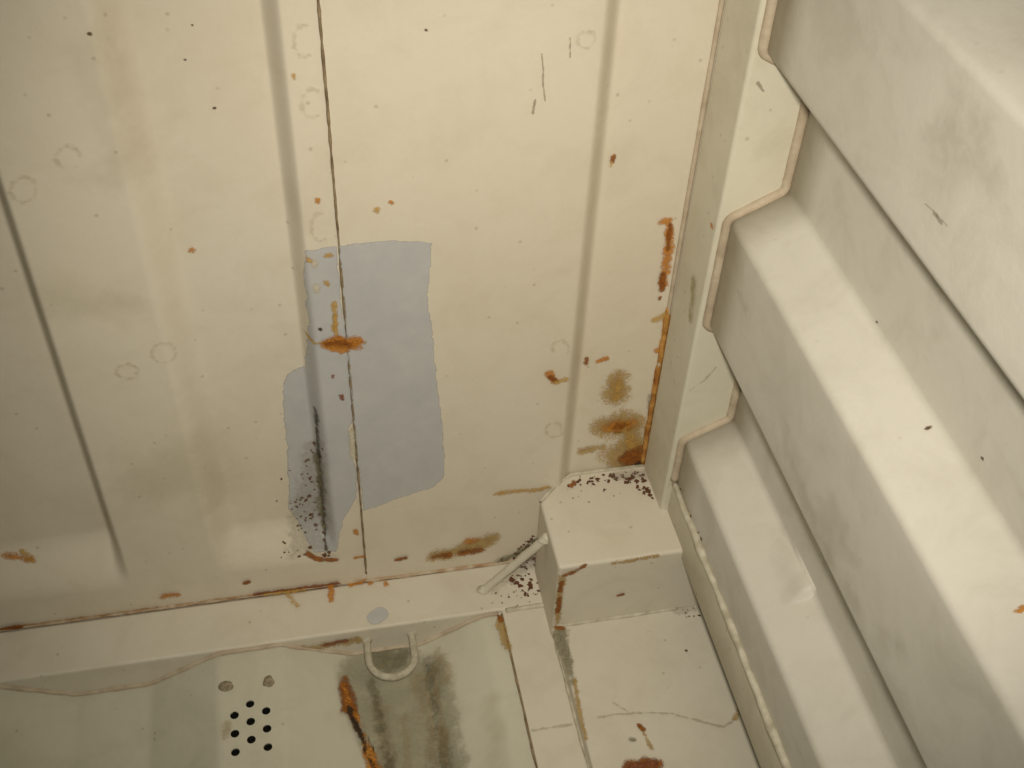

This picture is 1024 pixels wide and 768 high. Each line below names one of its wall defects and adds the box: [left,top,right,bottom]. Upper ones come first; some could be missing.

rust [305,301,366,354]
rust [578,218,674,467]
peeling [276,441,331,558]
crack [305,406,339,562]
rust [495,486,550,495]
rust [1,549,34,563]
rust [427,533,499,561]
rust [241,580,389,607]
rust [555,564,587,624]
rust [302,636,465,768]
rust [622,723,663,768]